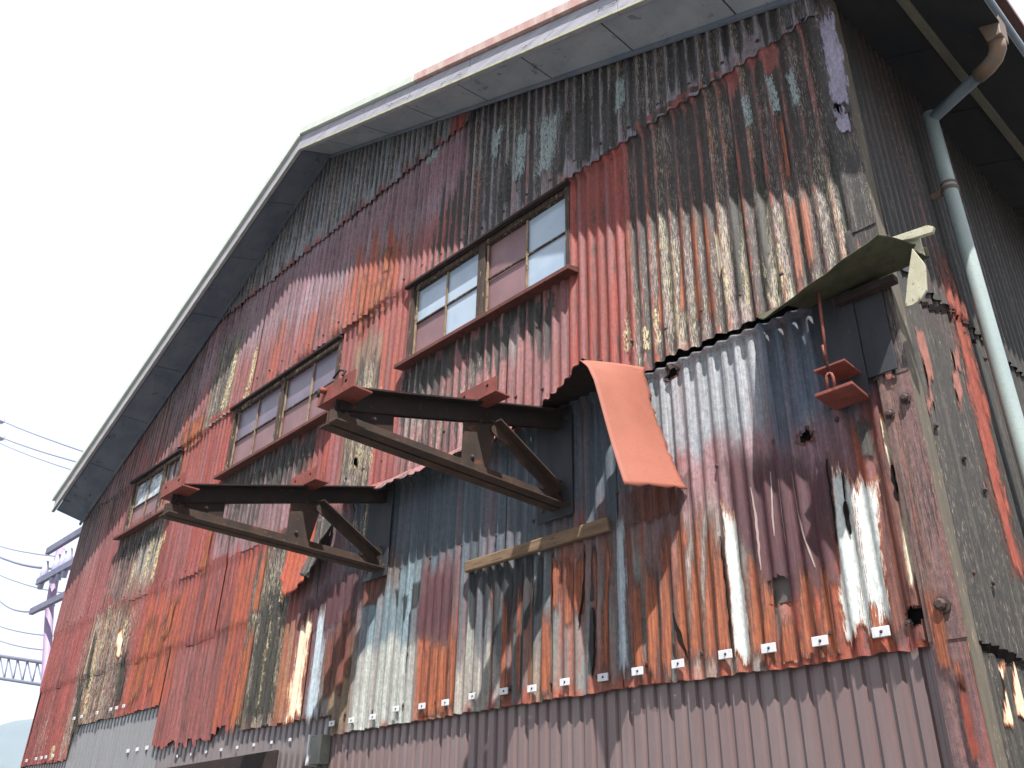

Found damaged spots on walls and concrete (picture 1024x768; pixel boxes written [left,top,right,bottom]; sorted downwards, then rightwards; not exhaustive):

leakage [605,81,616,160]
peeling [814,8,851,133]
corrosion [677,204,714,324]
leakage [71,629,98,736]
leakage [114,649,128,709]
leakage [244,572,284,723]
corrosion [299,569,385,702]
corrosion [414,556,457,718]
corrosion [625,471,731,684]
peeling [720,498,752,668]
corrosion [725,445,842,668]
peeling [831,461,892,647]